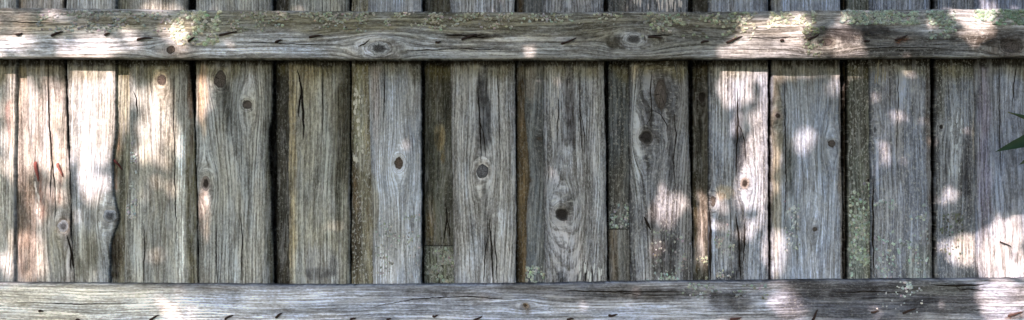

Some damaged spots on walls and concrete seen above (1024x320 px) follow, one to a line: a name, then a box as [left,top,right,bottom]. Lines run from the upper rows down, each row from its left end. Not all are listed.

crack [297,70,324,138]
crack [735,88,746,175]